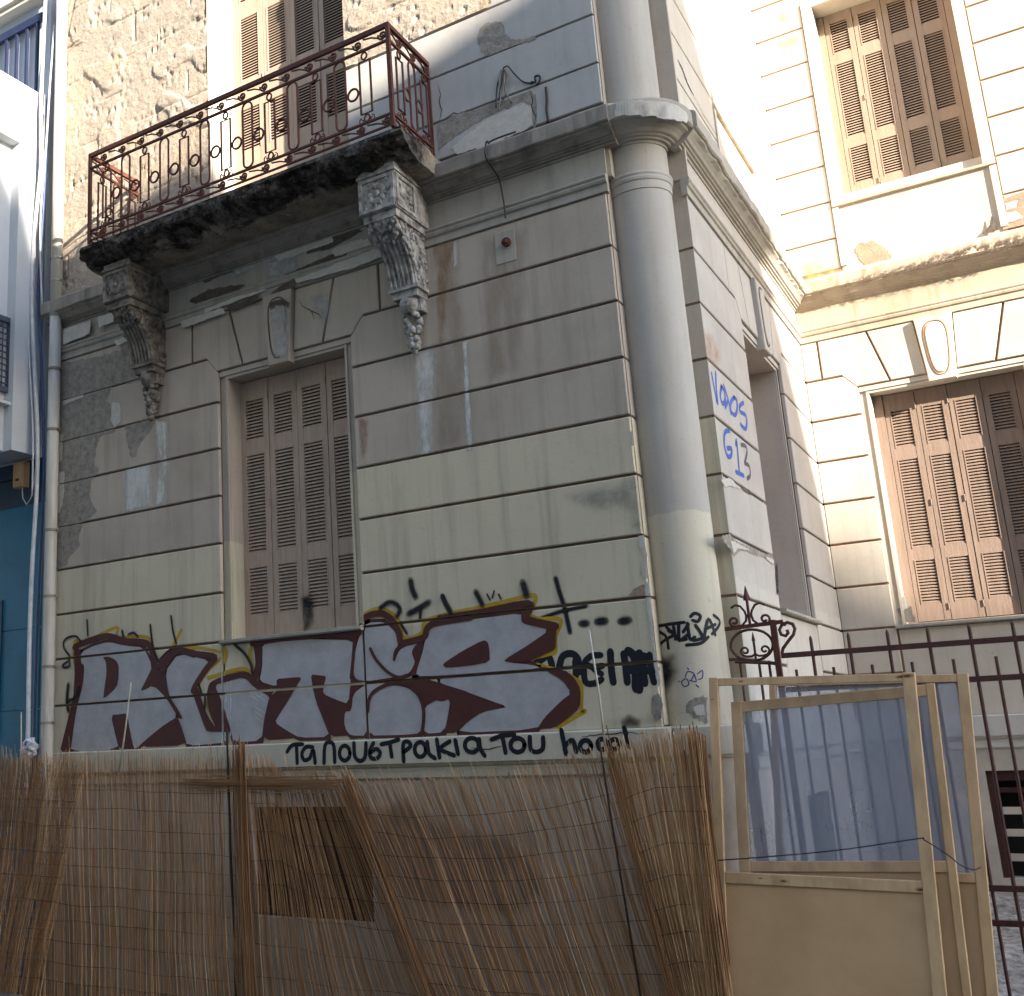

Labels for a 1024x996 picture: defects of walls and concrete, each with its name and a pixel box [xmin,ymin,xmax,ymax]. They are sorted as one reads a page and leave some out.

spalling [477,21,536,55]
spalling [437,91,537,154]
peeling [180,229,382,328]
spalling [848,192,1024,284]
peeling [63,313,114,345]
leakage [415,349,435,454]
leakage [463,342,472,451]
spalling [57,337,156,569]